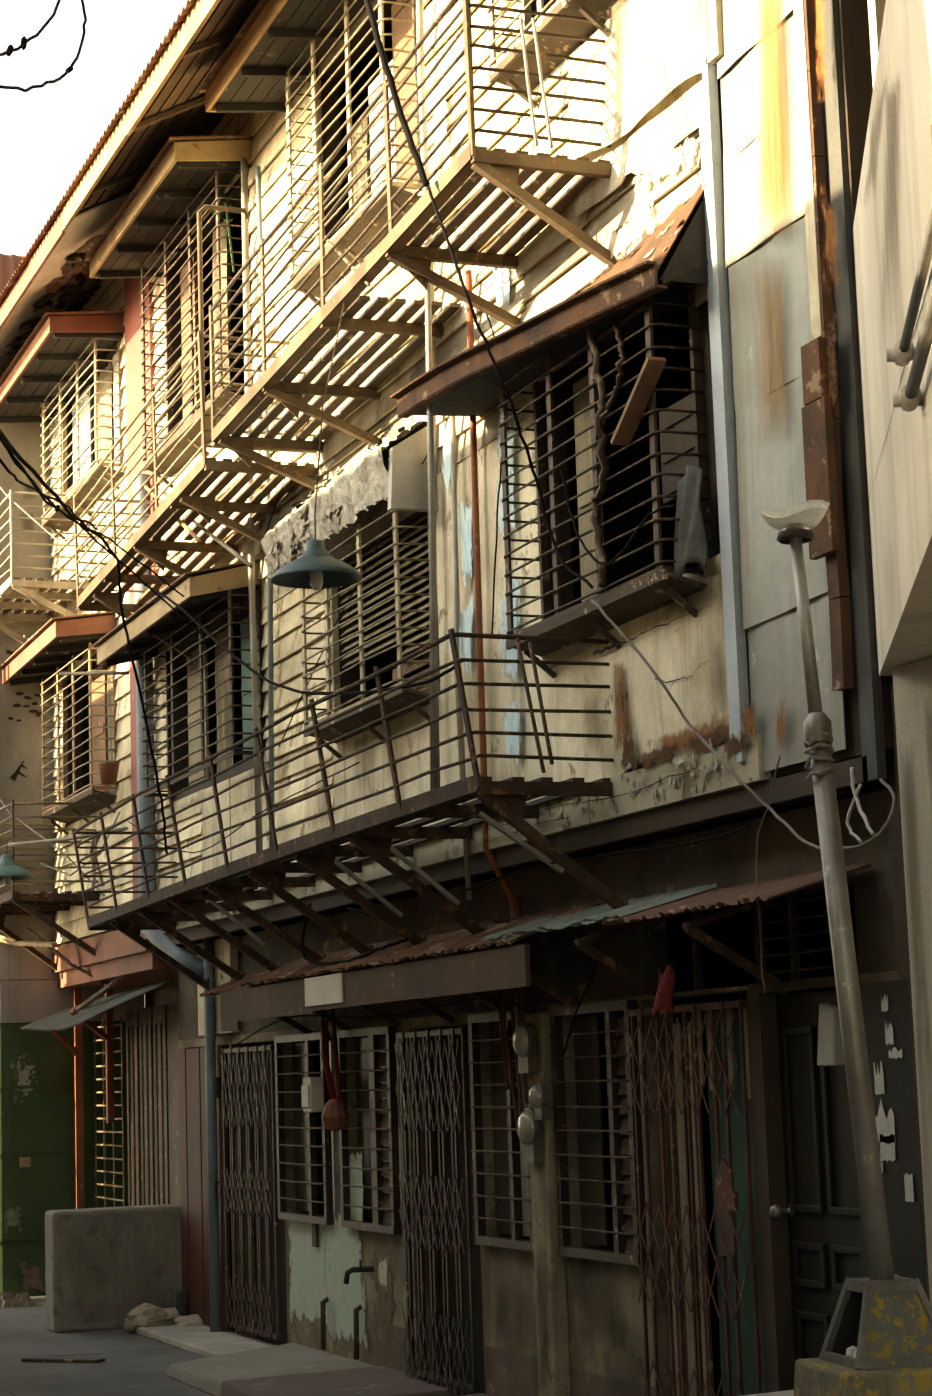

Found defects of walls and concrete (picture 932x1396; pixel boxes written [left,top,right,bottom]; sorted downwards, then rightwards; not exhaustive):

rust [758,0,787,207]
rust [758,286,784,416]
spalling [267,467,343,569]
rust [614,665,637,779]
rust [725,704,755,759]
peeling [7,1051,38,1103]